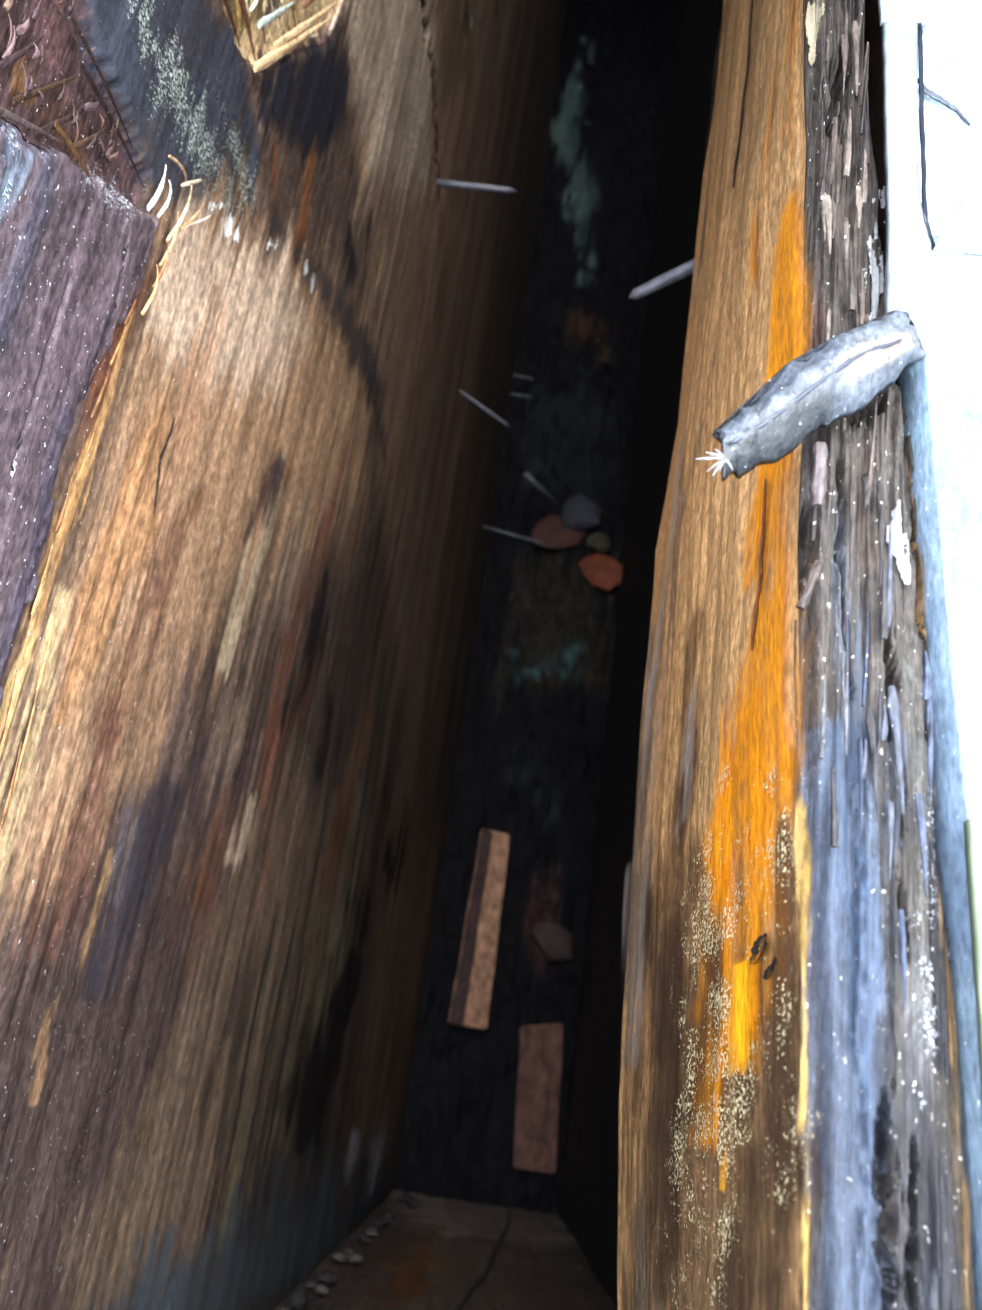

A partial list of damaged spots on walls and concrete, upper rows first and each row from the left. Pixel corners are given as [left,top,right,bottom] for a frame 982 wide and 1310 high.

water stain [78,0,387,458]
crack [420,0,440,191]
water stain [551,64,589,228]